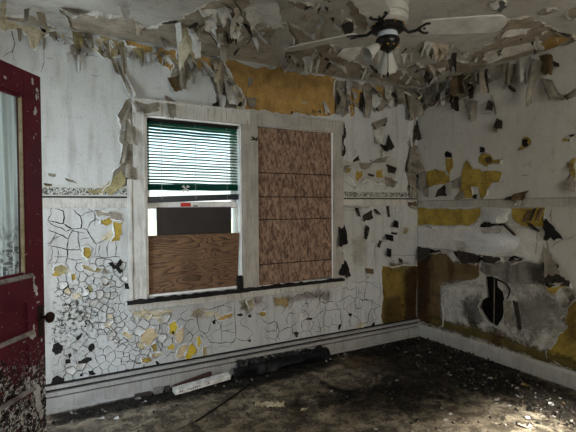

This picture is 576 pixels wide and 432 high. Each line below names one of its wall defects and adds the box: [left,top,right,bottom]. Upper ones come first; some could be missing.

peeling [0,0,576,123]
peeling [87,97,160,196]
spalling [94,210,124,242]
spalling [333,78,576,362]
spalling [52,246,123,301]
crack [47,209,382,380]
peeling [52,342,72,364]
water stain [428,316,576,372]
peeling [34,382,44,419]